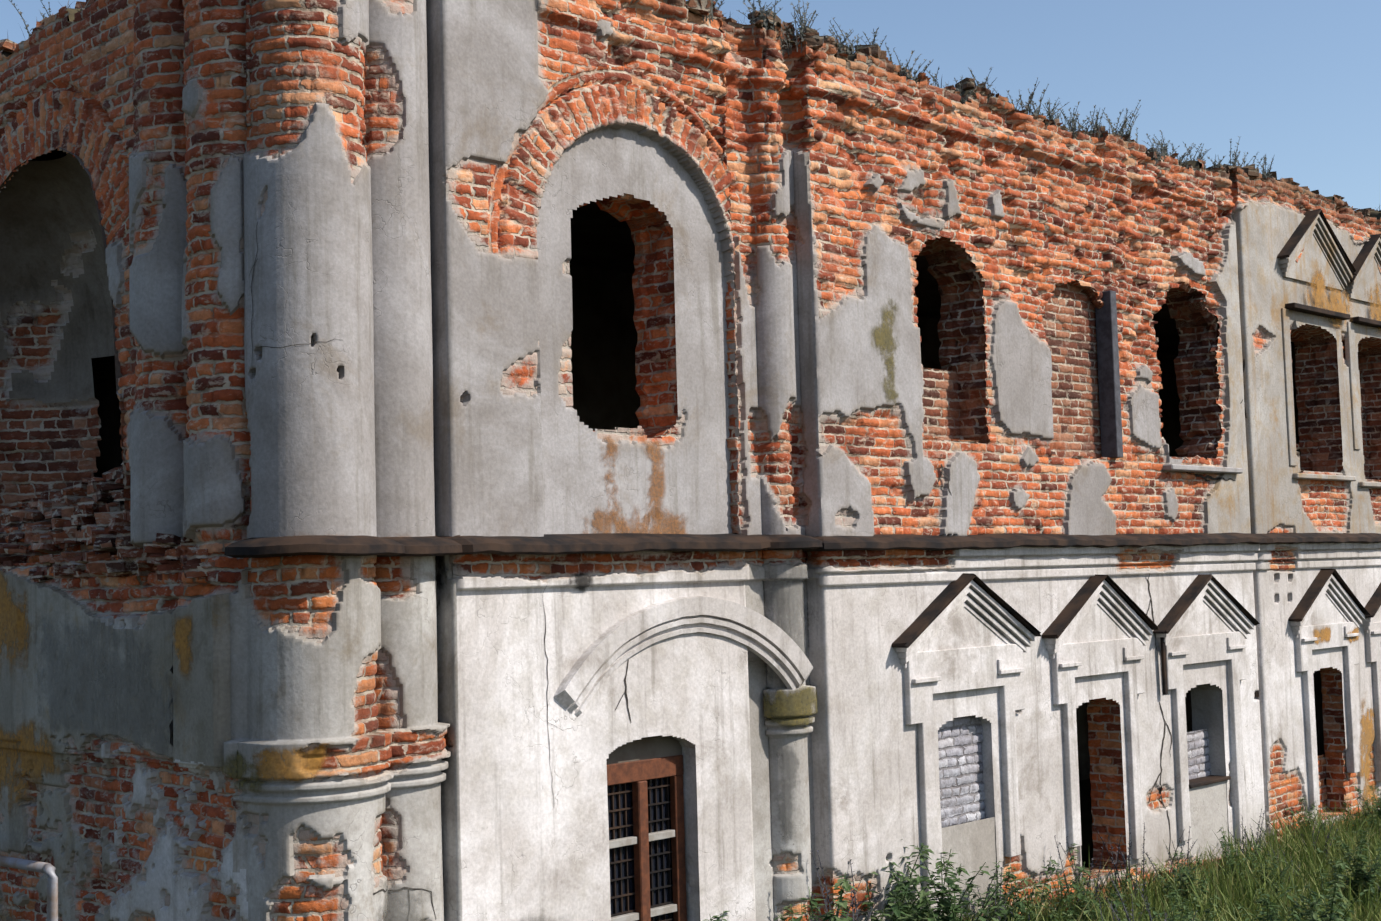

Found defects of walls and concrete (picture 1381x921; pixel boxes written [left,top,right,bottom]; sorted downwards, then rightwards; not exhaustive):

flaking render [0,152,192,526]
flaking render [116,0,548,546]
flaking render [449,147,980,582]
flaking render [989,301,1054,468]
flaking render [1127,365,1184,465]
flaking render [0,734,243,921]
flaking render [0,552,418,643]
flaking render [301,649,453,781]
crack [542,594,558,797]
crack [615,659,631,721]
crack [1146,573,1157,650]
crack [1148,702,1172,852]